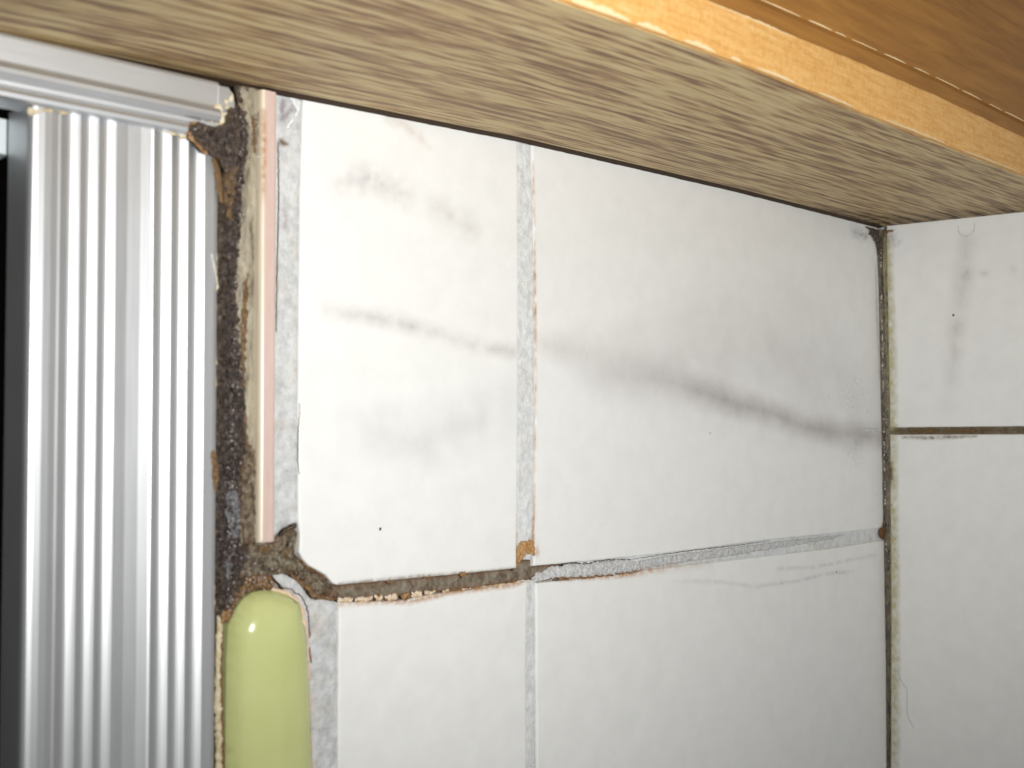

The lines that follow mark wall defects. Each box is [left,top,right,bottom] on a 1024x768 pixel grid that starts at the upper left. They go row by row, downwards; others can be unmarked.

corrosion [252,113,265,153]
corrosion [516,517,535,563]
corrosion [221,562,280,623]